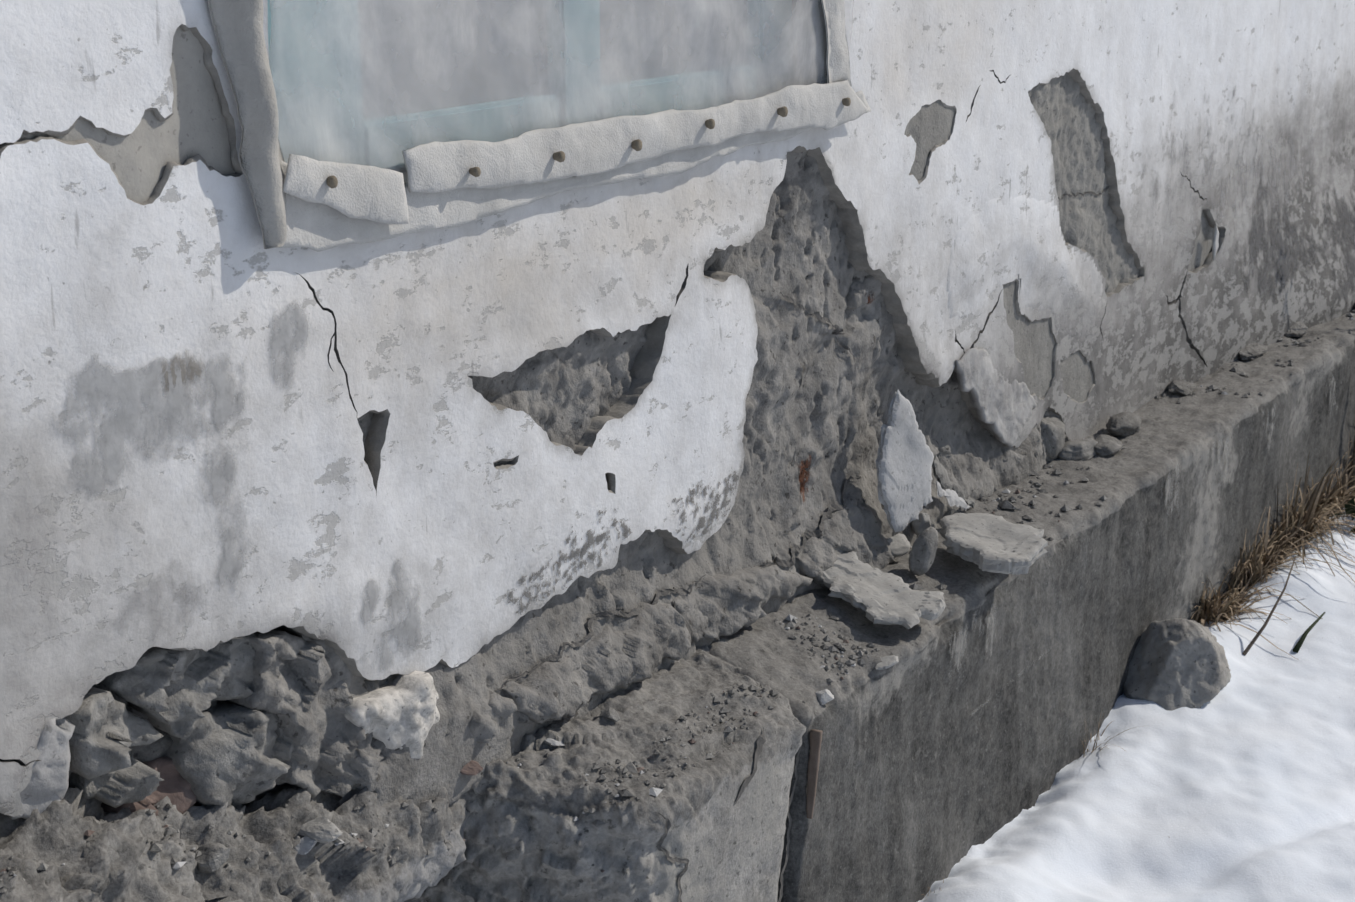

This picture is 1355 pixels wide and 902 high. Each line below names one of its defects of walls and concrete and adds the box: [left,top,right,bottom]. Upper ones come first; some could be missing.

flaking render [0,24,243,205]
flaking render [904,100,957,184]
flaking render [1028,68,1145,297]
crack [1181,173,1207,201]
water stain [1245,155,1355,306]
crack [297,273,359,421]
crack [1166,270,1207,366]
flaking render [7,146,1096,819]
crack [0,759,42,767]
crack [655,812,689,902]